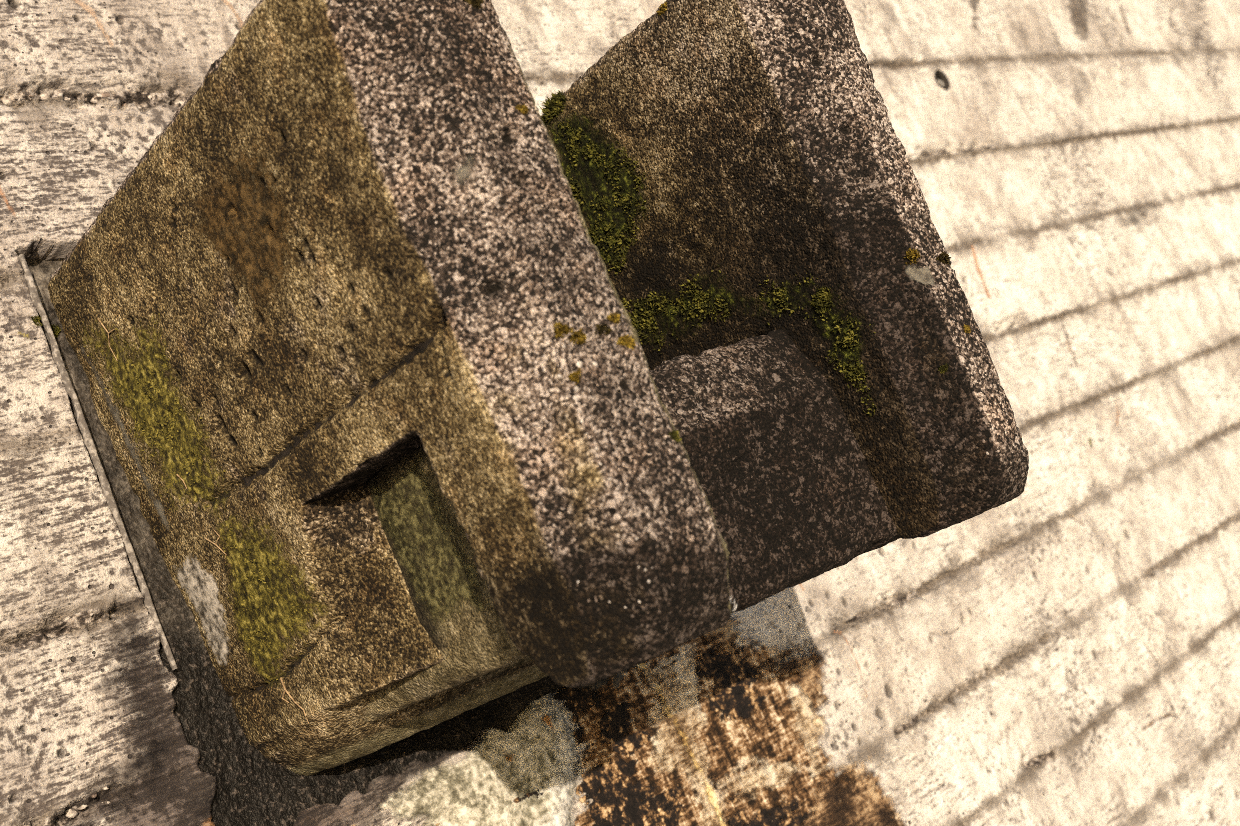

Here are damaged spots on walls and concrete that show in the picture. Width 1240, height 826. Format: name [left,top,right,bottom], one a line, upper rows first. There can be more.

leakage [176,557,229,664]
corrosion [552,618,907,826]